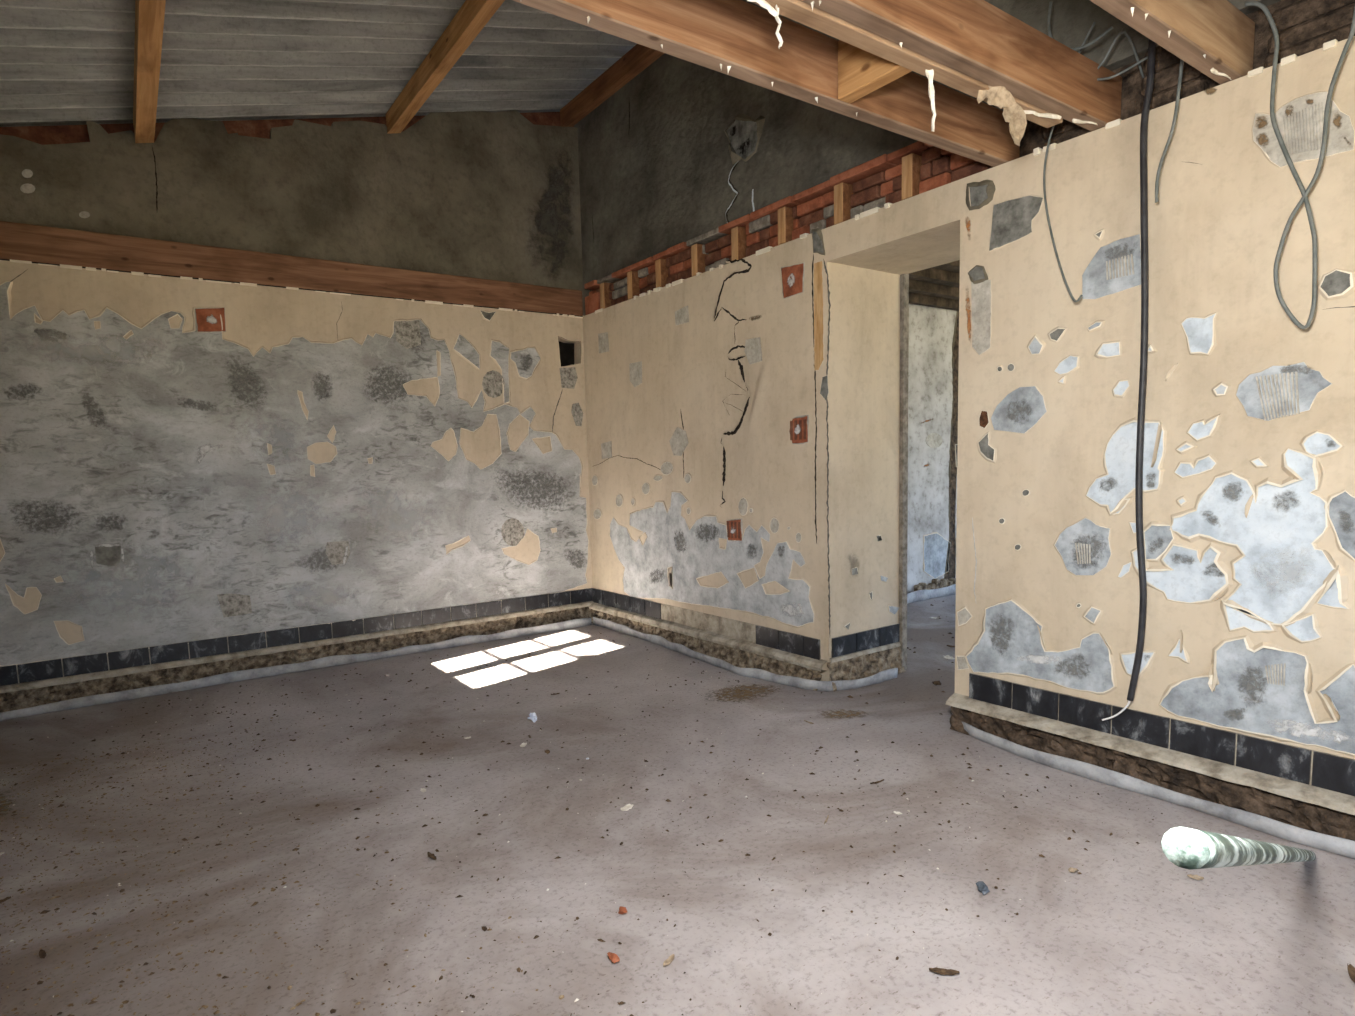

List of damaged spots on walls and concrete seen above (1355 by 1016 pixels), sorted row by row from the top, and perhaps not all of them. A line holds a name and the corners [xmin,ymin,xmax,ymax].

crack [725,162,755,223]
flaking render [966,180,996,211]
flaking render [781,228,825,299]
flaking render [968,265,988,284]
peeling [1317,268,1355,301]
peeling [1180,312,1218,356]
crack [713,259,752,508]
peeling [0,281,815,666]
crack [592,414,684,477]
peeling [956,414,1355,757]
flaking render [0,607,906,713]
flaking render [950,706,1355,841]